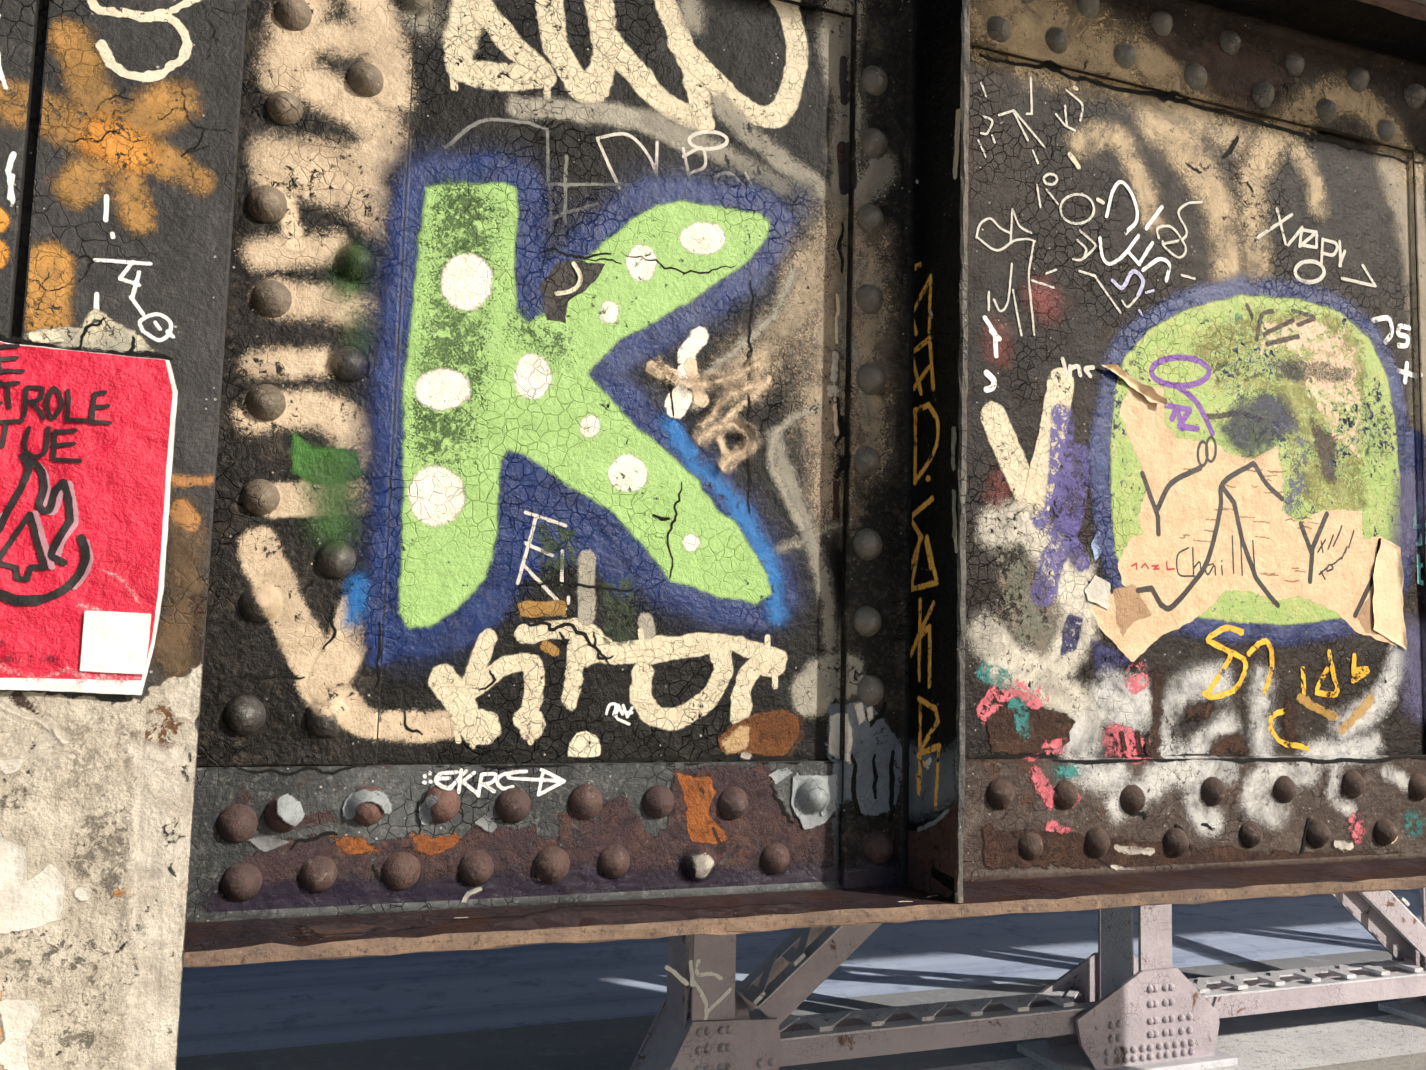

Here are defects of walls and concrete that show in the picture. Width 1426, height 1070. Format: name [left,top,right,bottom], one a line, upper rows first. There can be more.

crack [0,251,173,361]
crack [586,254,755,514]
crack [245,579,337,679]
crack [514,621,614,663]
crack [224,710,835,776]
peeling [986,707,1075,755]
peeling [1114,727,1152,759]
peeling [0,664,202,1070]
peeling [240,699,958,902]
corrosion [676,772,728,845]
peeling [982,817,1422,870]
corrosion [454,903,811,930]